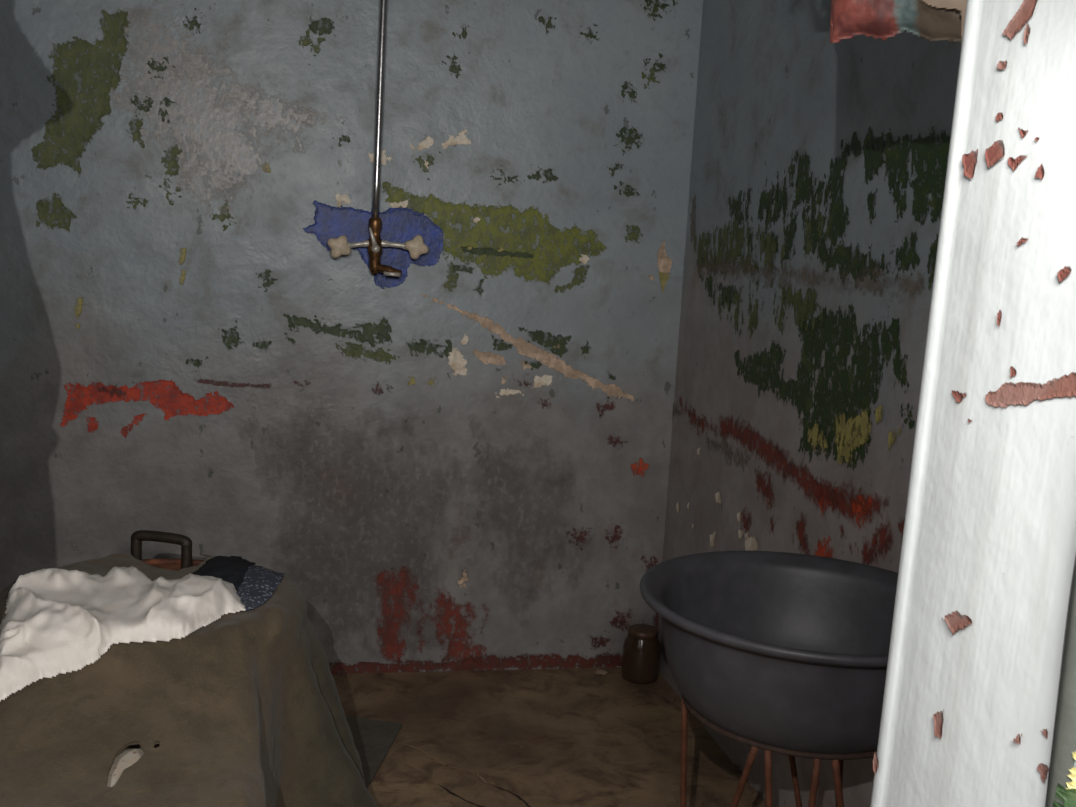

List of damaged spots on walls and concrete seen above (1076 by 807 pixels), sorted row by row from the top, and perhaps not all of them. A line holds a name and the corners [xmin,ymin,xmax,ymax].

peeling [31,10,129,174]
peeling [127,95,174,148]
peeling [159,144,183,205]
peeling [409,127,473,180]
peeling [490,166,559,185]
peeling [609,117,643,197]
peeling [36,193,77,231]
peeling [283,182,634,419]
peeling [690,127,950,471]
peeling [61,357,270,438]
crack [440,785,531,807]
peeling [1053,752,1076,807]